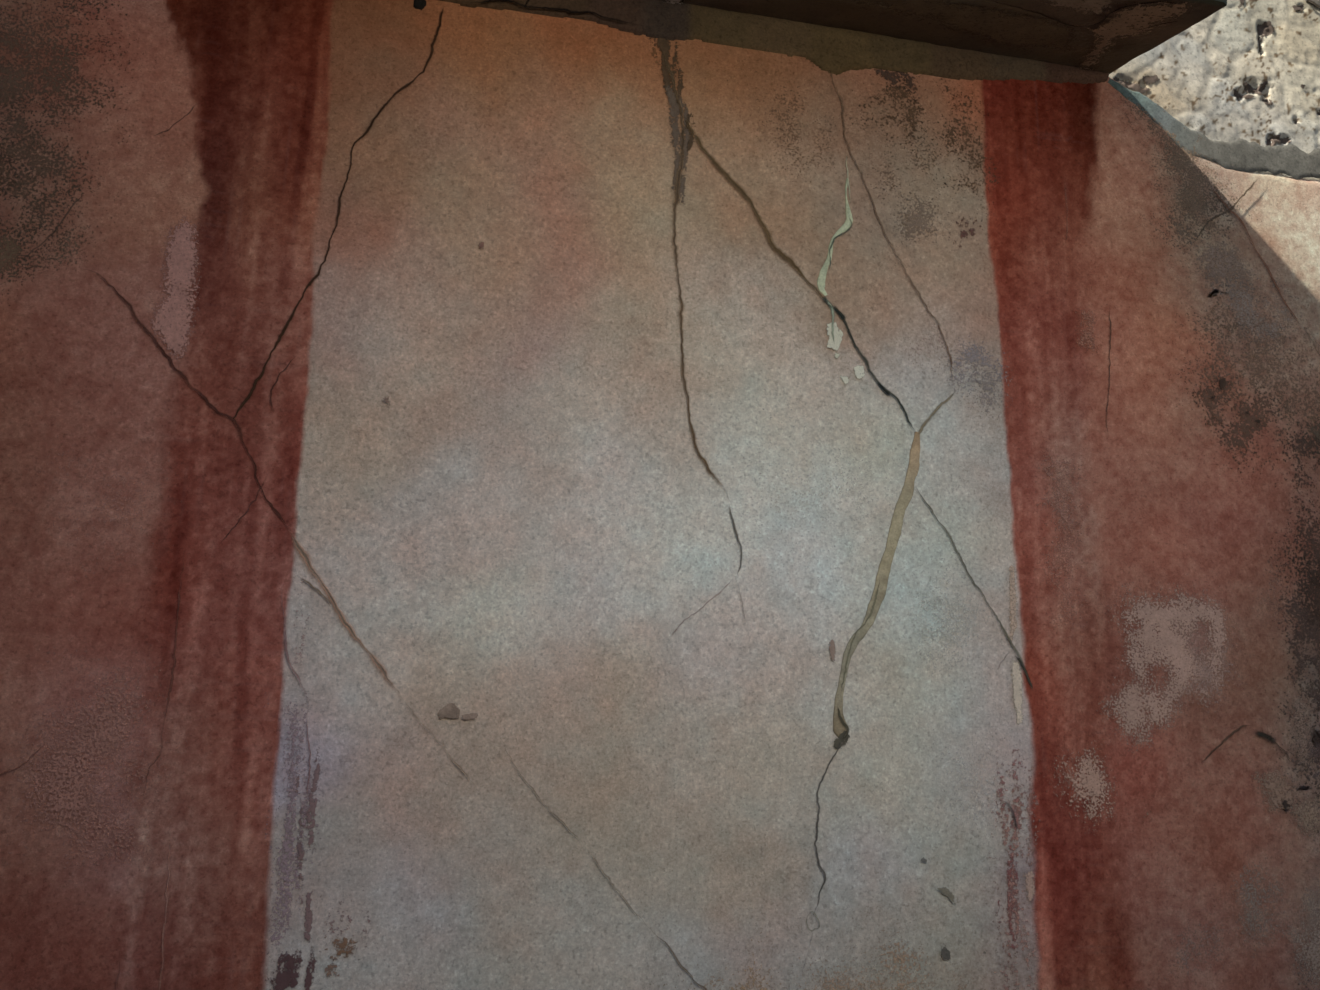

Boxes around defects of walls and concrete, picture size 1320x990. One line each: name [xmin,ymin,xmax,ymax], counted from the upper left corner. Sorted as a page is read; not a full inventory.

crack [476,0,627,23]
water stain [0,0,137,295]
crack [101,10,443,715]
crack [665,59,953,632]
mould [1122,87,1320,841]
crack [919,493,1033,688]
crack [304,723,312,790]
crack [509,755,636,914]
crack [806,743,840,931]
crack [661,939,707,990]